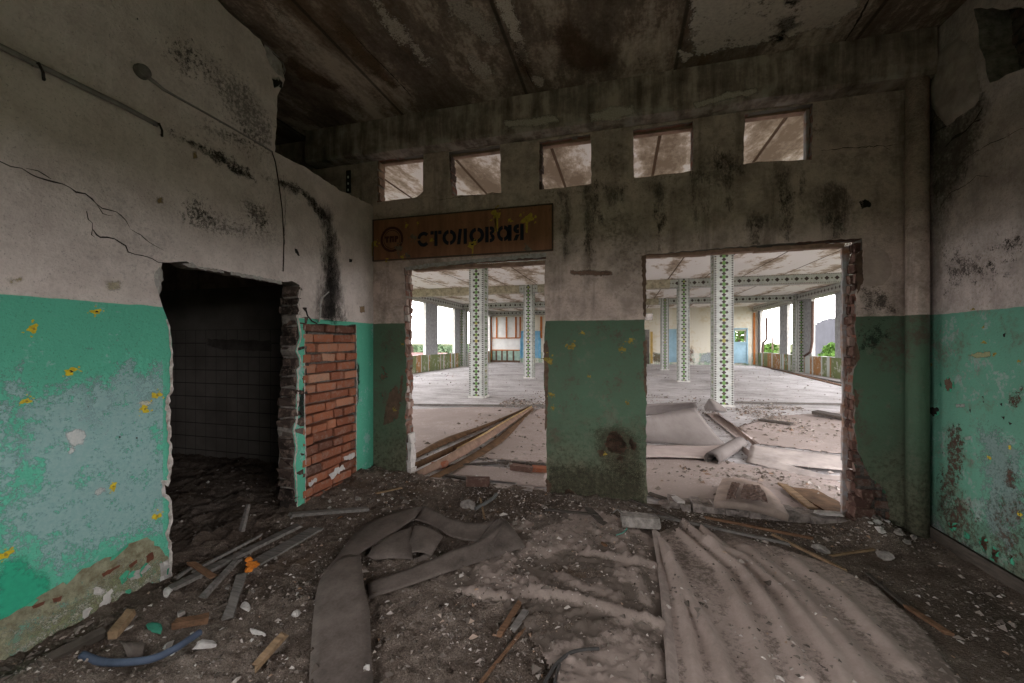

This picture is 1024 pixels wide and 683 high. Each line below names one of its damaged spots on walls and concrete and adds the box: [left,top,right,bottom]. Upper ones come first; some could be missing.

leakage [163,37,272,148]
leakage [930,95,984,207]
crack [0,161,163,263]
leakage [179,191,271,242]
spalling [856,250,864,293]
peeling [0,319,174,660]
peeling [930,407,1024,573]